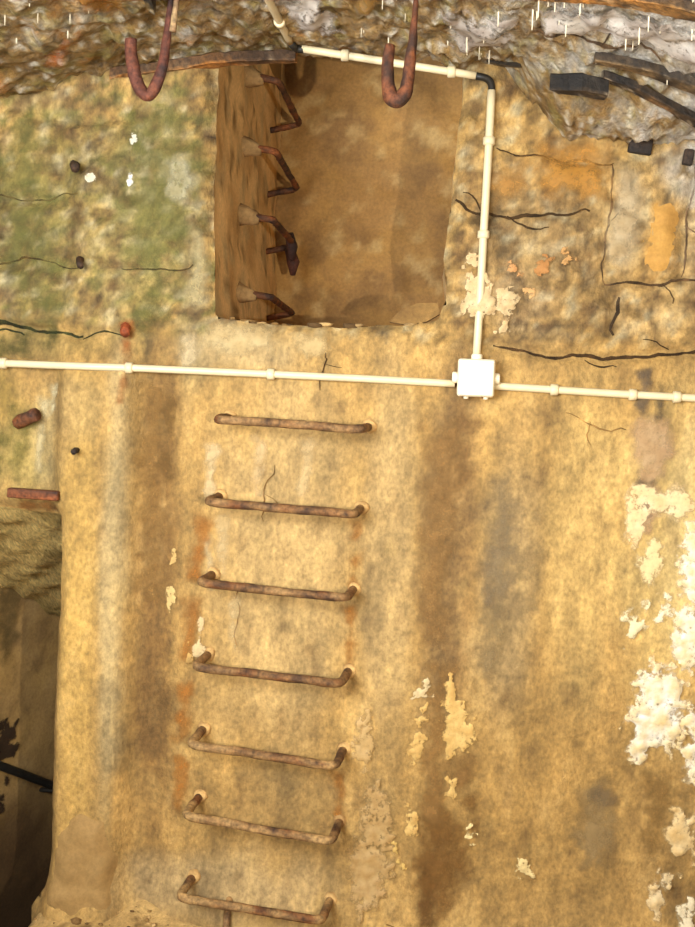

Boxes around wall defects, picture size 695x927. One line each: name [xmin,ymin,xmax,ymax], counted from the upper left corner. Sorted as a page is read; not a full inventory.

efflorescence [285,0,345,36]
efflorescence [441,12,517,53]
efflorescence [541,10,695,64]
efflorescence [167,161,191,199]
efflorescence [188,239,206,303]
crack [455,148,695,368]
crack [0,319,121,340]
flaking render [625,420,695,584]
water stain [482,496,516,639]
rust [182,610,196,657]
water stain [416,666,477,927]